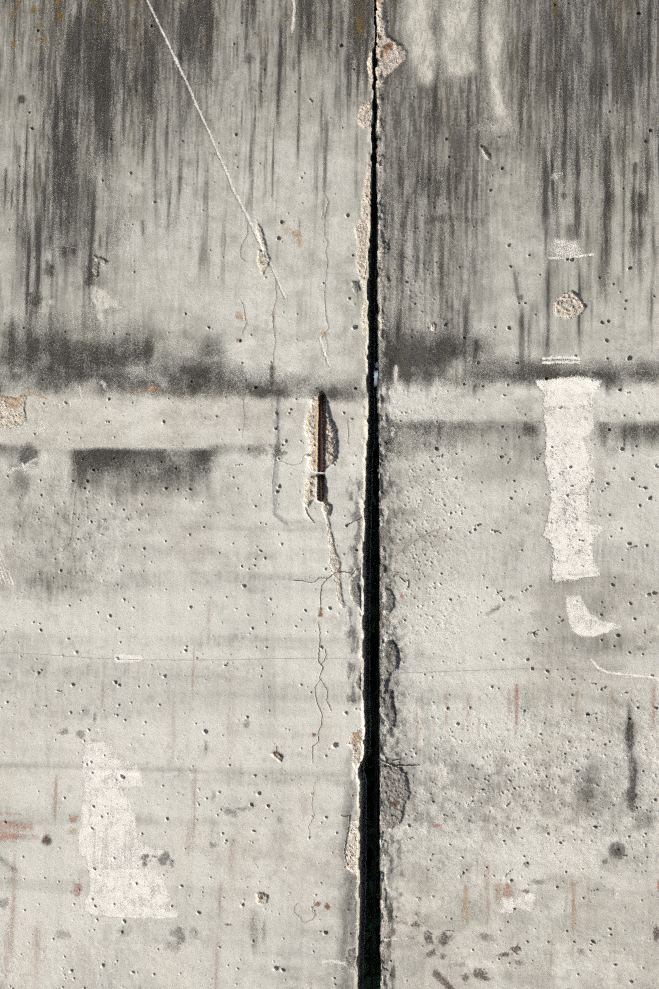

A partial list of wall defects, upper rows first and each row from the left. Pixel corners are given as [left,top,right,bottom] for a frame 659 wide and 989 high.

spalling [358,0,407,134]
damp [402,0,530,131]
damp [542,62,581,241]
damp [26,187,62,316]
damp [382,308,482,391]
damp [503,315,616,390]
spalling [554,290,586,319]
damp [73,449,218,488]
spalling [305,392,362,608]
spalling [352,146,411,865]
crack [0,567,361,834]
spalling [349,729,363,769]